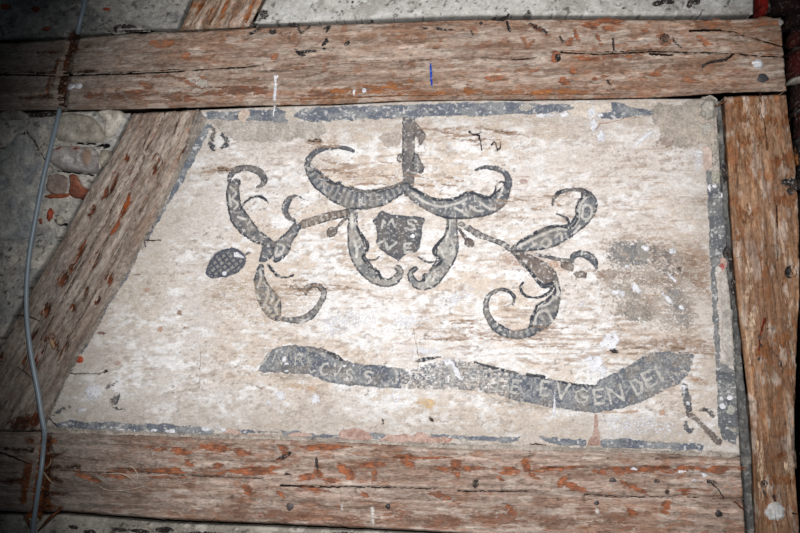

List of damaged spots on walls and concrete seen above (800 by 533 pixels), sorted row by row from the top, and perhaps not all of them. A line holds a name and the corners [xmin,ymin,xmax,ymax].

peeling [632,131,674,148]
flaking render [299,428,473,451]